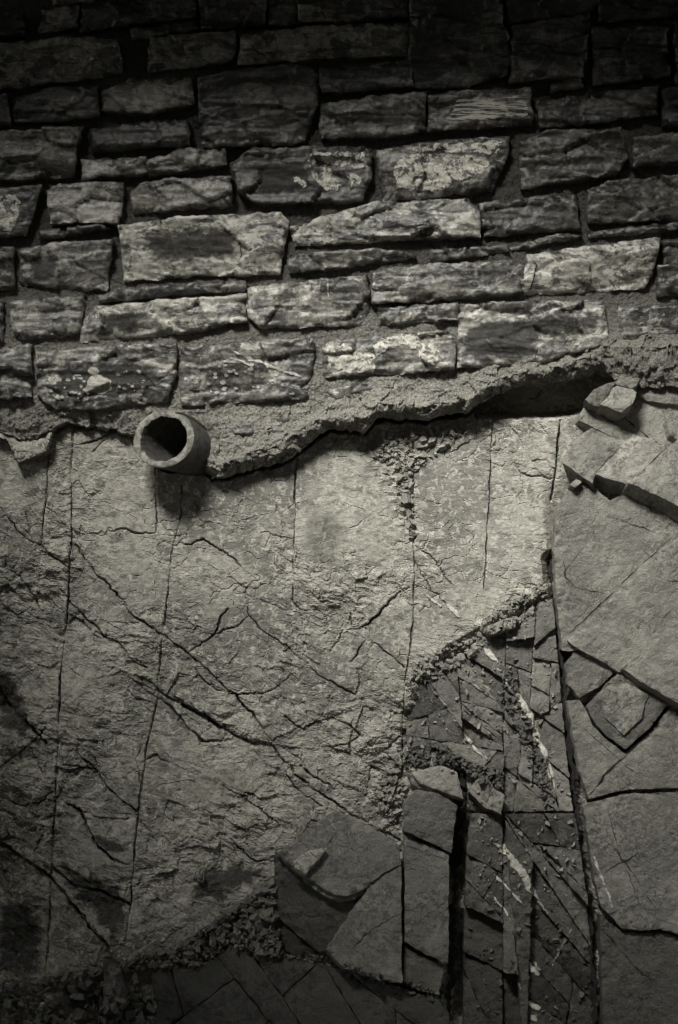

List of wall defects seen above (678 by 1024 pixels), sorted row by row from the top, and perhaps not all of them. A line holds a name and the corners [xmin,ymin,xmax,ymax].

crack [517,420,561,496]
crack [0,428,467,1024]
spalling [407,753,505,817]
crack [547,514,678,1024]
spalling [303,877,369,903]